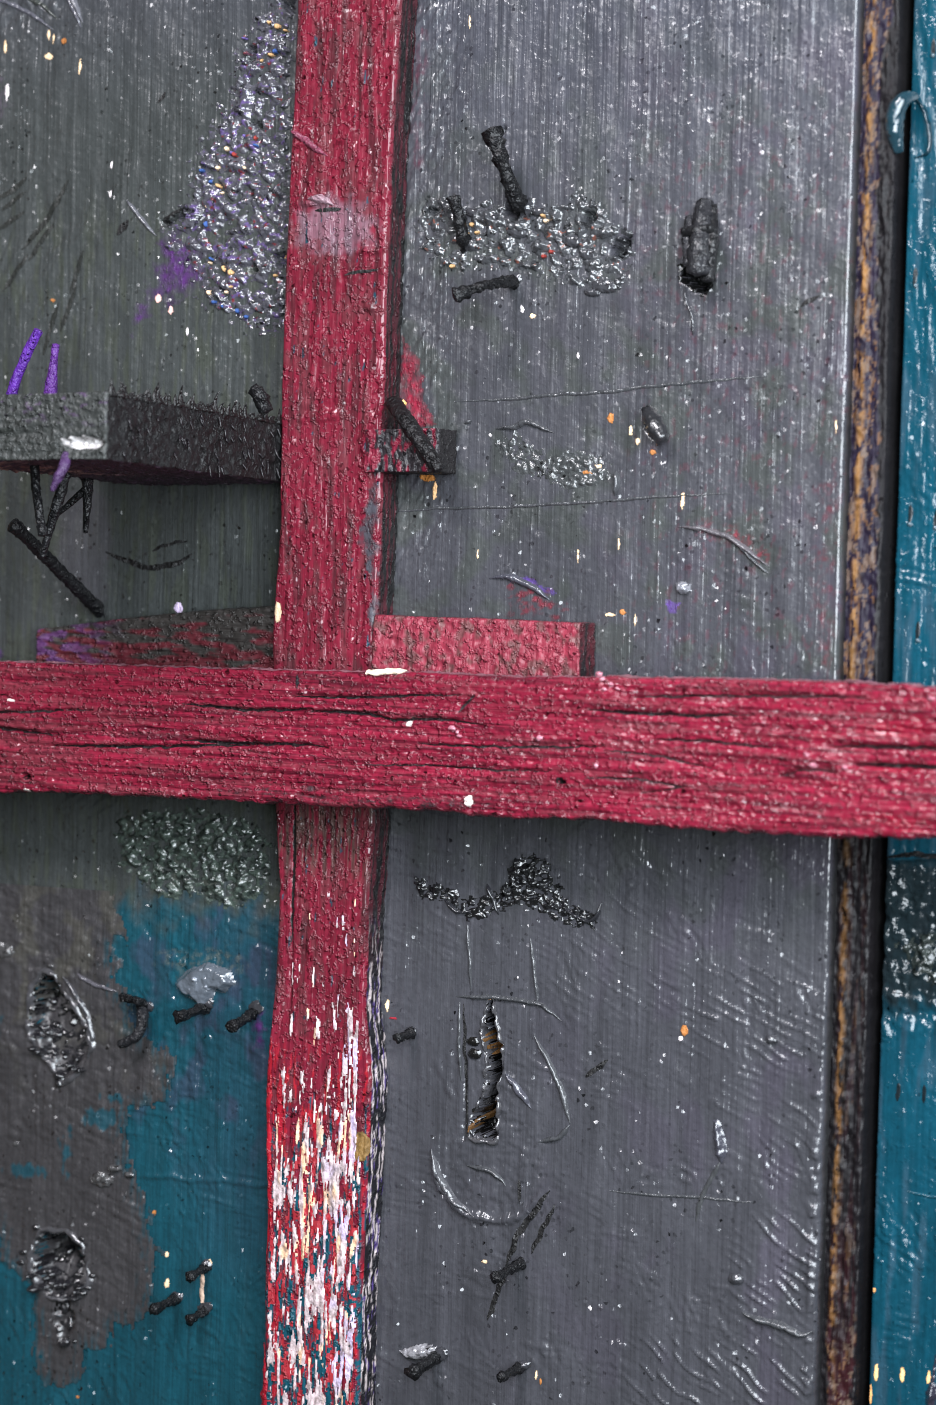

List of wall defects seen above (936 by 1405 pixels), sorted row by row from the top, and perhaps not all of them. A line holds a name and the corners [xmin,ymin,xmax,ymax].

crack [0,693,936,793]
peeling [260,899,361,1405]